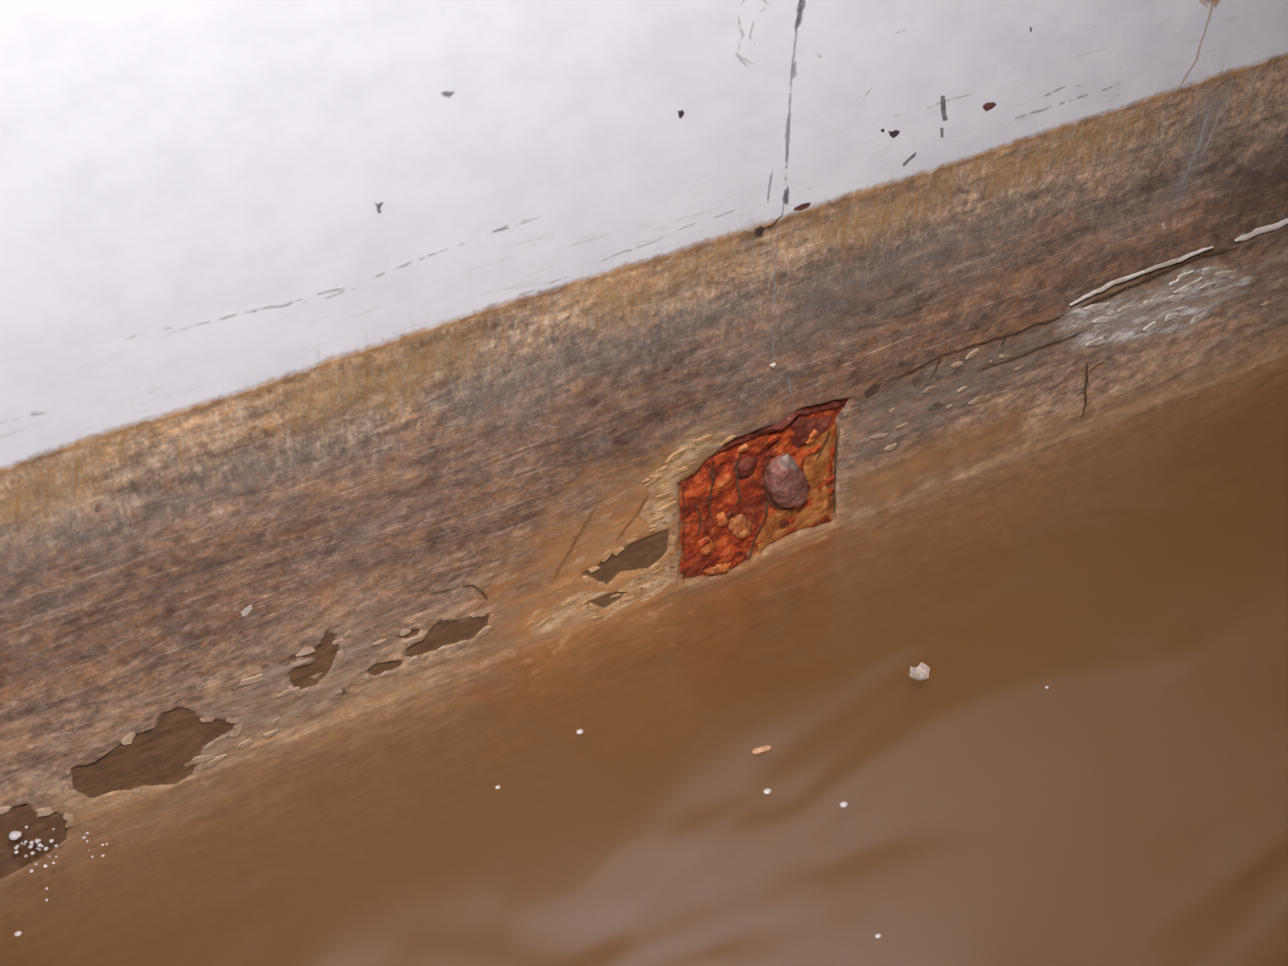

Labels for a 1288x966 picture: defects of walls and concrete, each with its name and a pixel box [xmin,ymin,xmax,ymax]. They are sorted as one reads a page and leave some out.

crack [763,0,805,406]
crack [890,248,1237,419]
spalling [864,384,881,399]
spalling [912,348,1024,411]
spalling [526,398,848,626]
corrosion [483,461,847,709]
peeling [239,610,492,697]
peeling [66,709,280,798]
peeling [0,805,74,879]